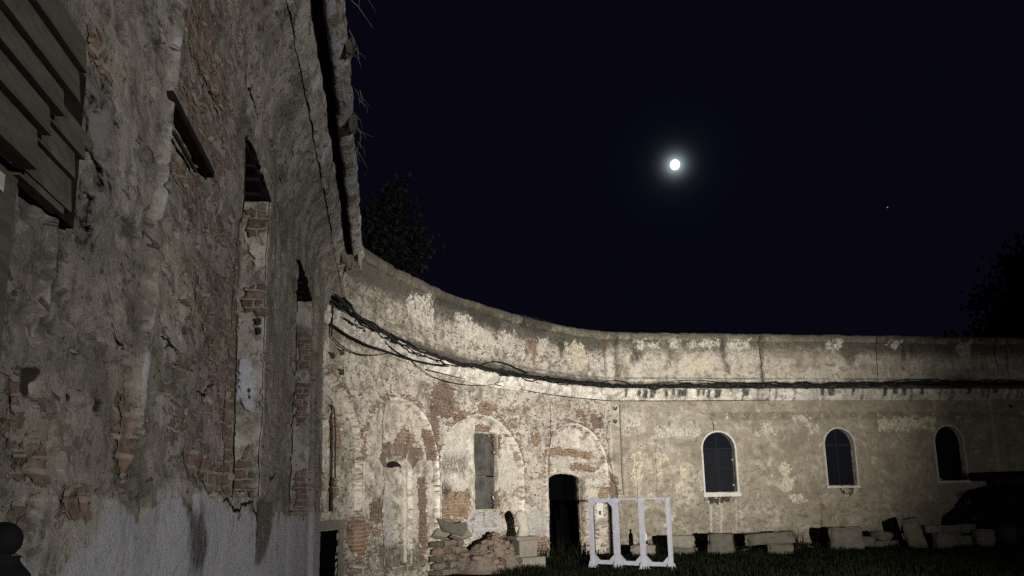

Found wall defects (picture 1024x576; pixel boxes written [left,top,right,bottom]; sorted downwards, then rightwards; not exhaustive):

flaking render [182,204,270,500]
flaking render [0,365,93,535]
flaking render [110,388,146,496]
damp [191,510,207,575]
damp [256,499,273,565]
flaking render [291,378,550,560]